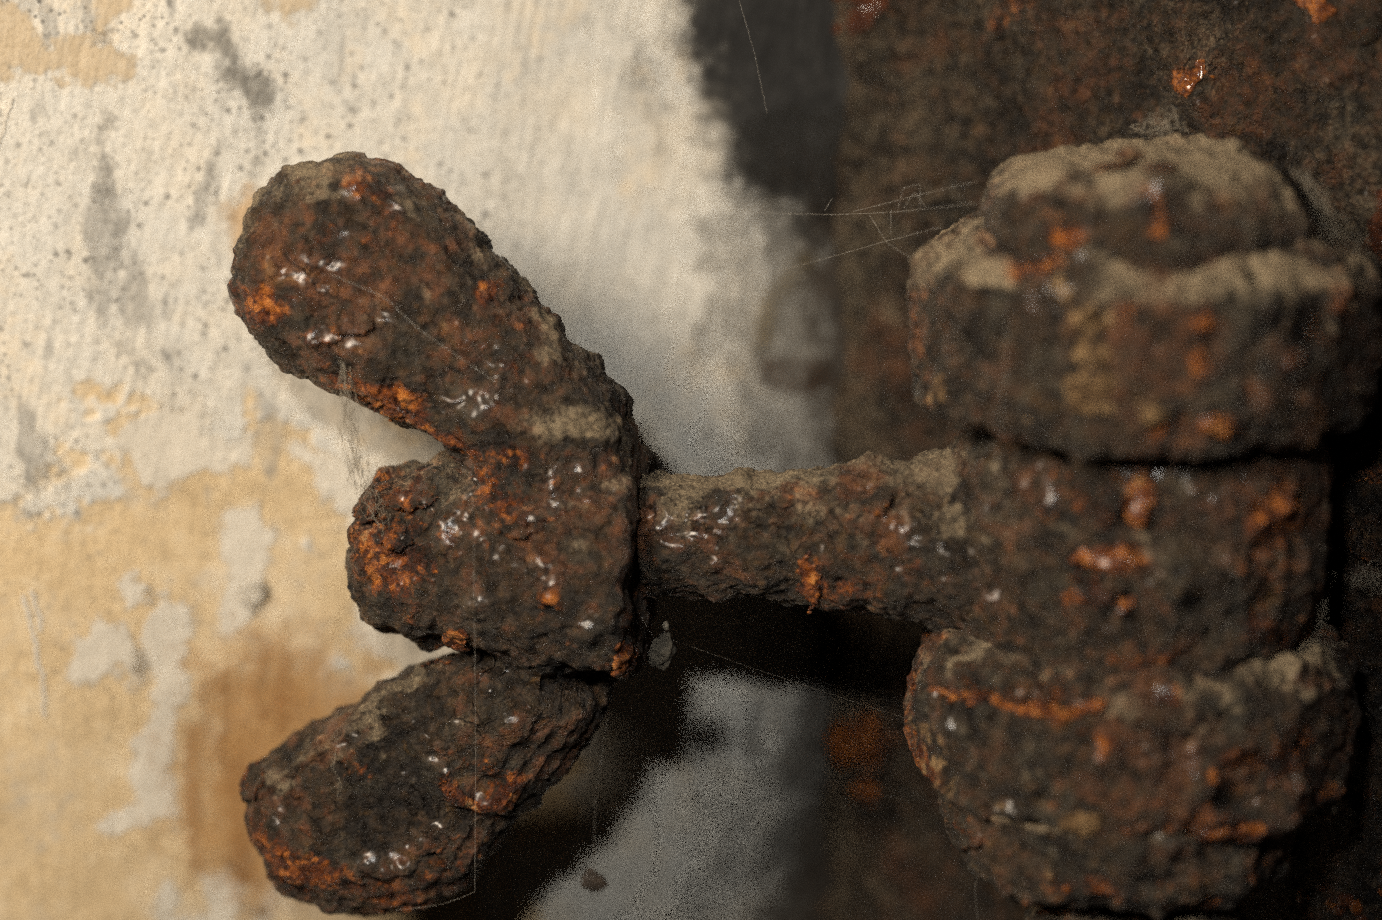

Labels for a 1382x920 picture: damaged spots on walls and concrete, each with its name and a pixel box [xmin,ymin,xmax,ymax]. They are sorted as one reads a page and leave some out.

rust [303,325,345,350]
peeling [116,401,253,501]
peeling [287,438,372,526]
rust [352,487,438,552]
peeling [218,501,276,636]
rust [795,551,821,614]
rust [1069,544,1138,571]
peeling [344,604,422,670]
rust [420,629,472,668]
peeling [66,569,196,836]
rust [191,653,362,883]
peeling [151,865,279,920]